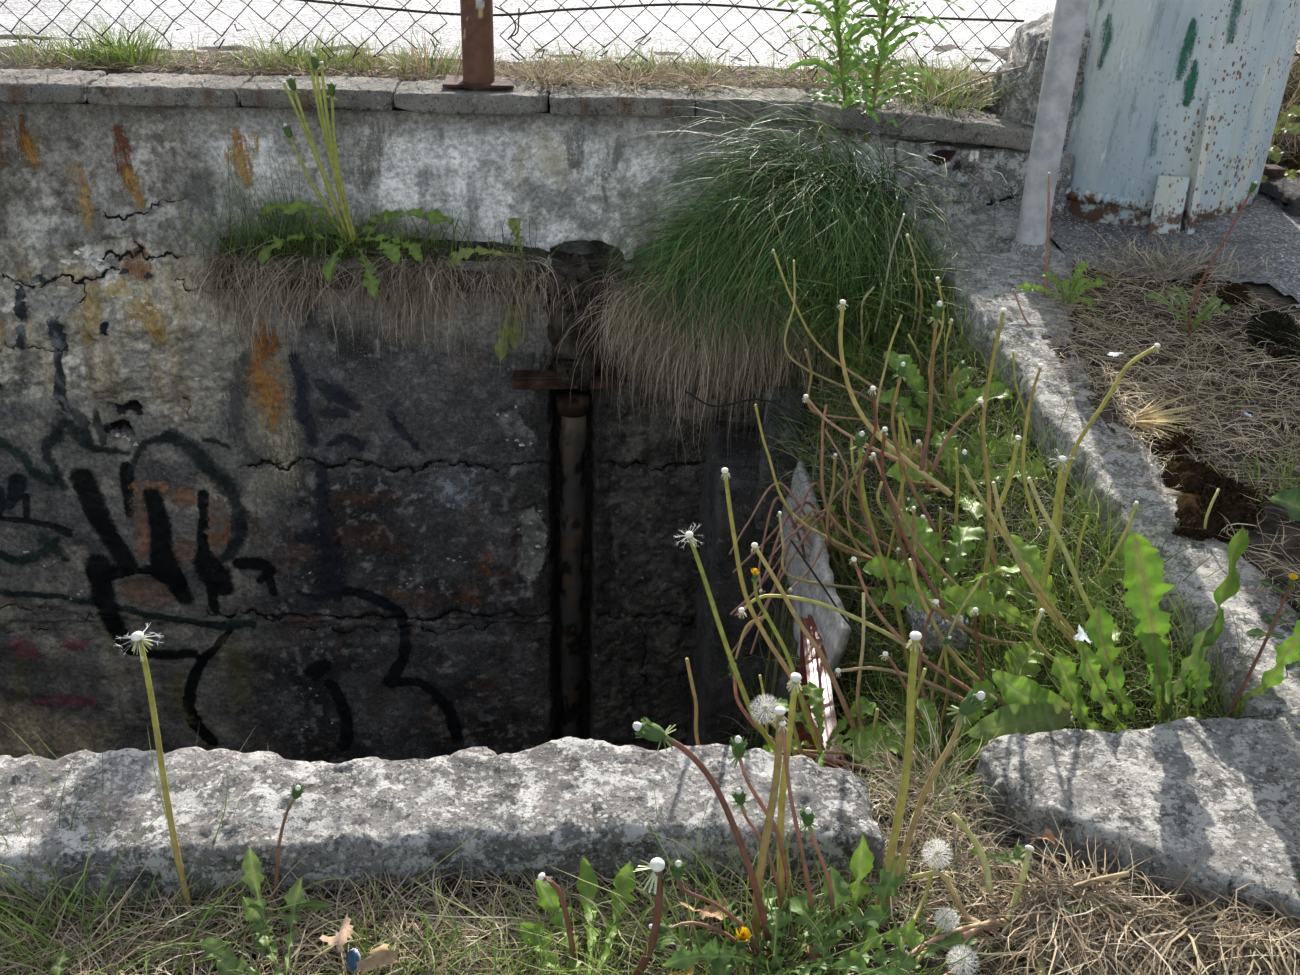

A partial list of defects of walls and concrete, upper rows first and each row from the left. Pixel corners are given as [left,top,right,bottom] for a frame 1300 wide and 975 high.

corrosion [0,114,39,169]
corrosion [111,125,145,209]
crack [0,193,222,353]
crack [239,457,541,474]
crack [617,461,700,472]
crack [206,608,545,635]